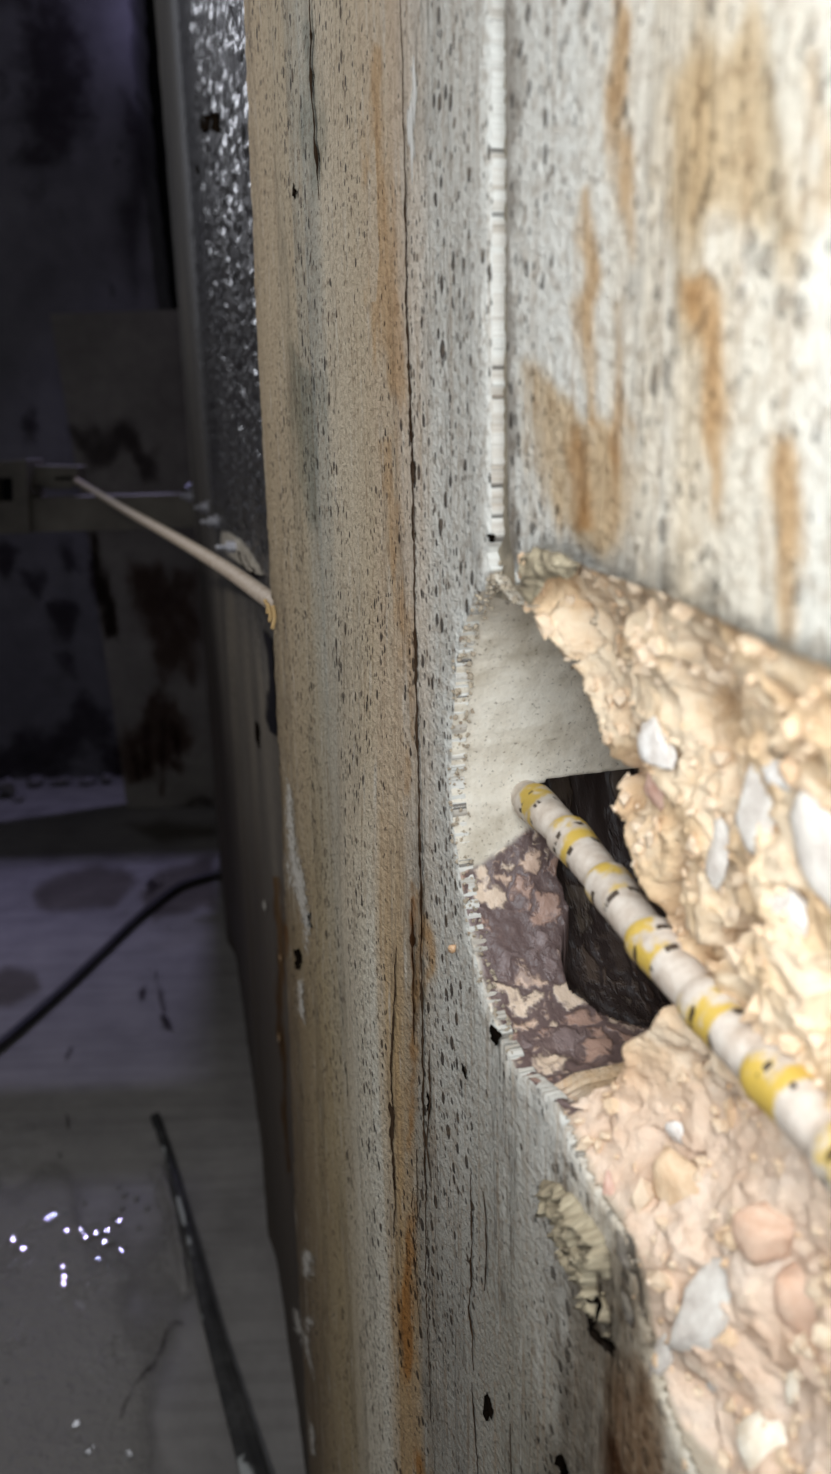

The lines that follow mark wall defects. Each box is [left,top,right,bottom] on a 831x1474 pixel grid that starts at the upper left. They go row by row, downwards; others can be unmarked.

crack [388,0,435,1470]
spalling [517,547,831,1110]
crack [468,1175,512,1474]
spalling [533,1004,831,1474]